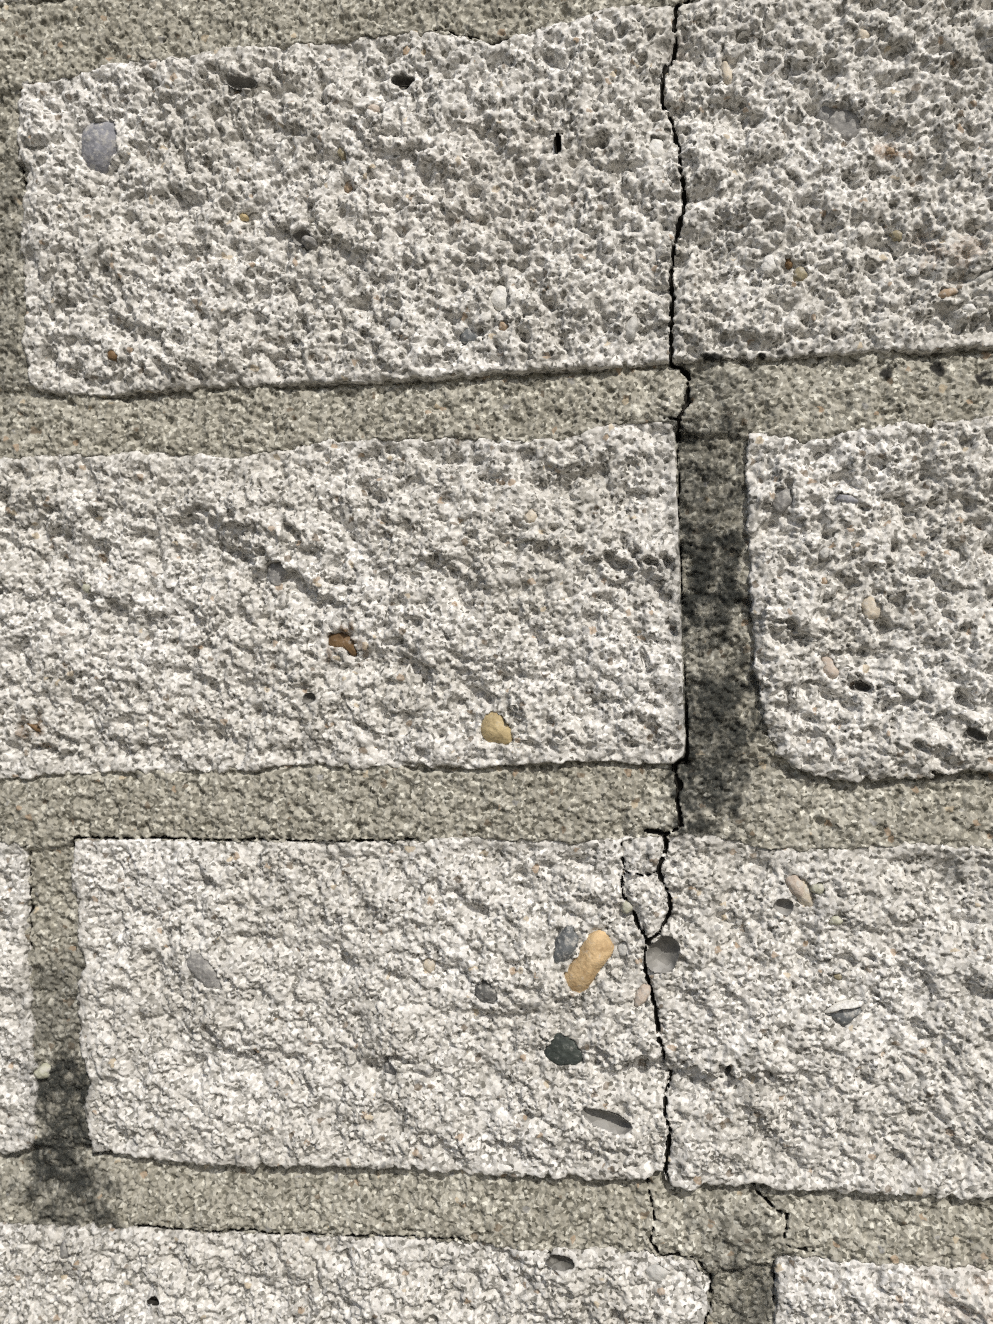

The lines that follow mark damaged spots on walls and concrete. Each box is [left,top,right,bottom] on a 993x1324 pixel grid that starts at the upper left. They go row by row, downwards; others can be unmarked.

crack [660,0,690,598]
leakage [666,416,746,643]
leakage [669,660,761,839]
crack [621,669,712,1324]
leakage [12,1052,118,1227]
crack [752,1183,814,1299]